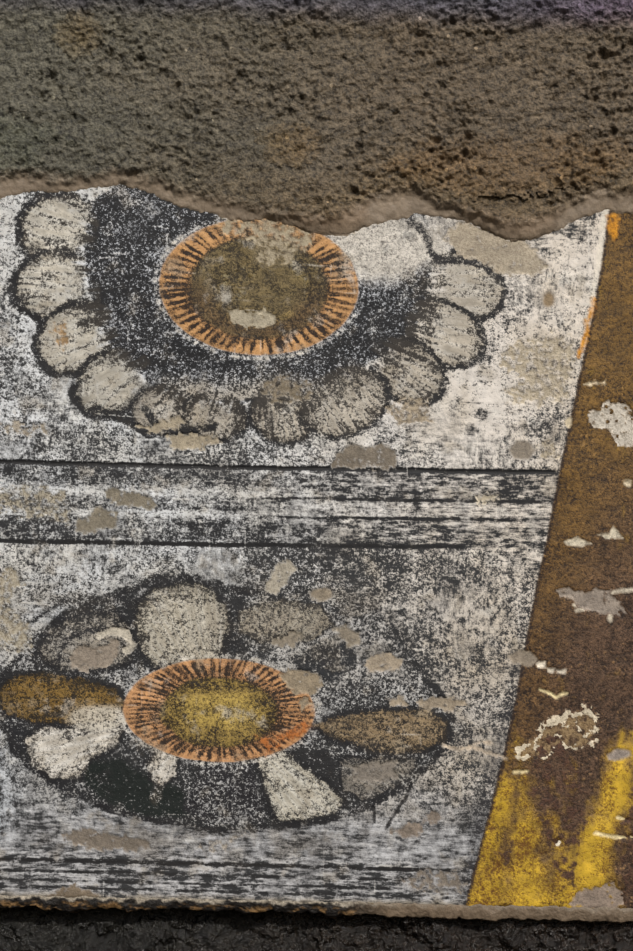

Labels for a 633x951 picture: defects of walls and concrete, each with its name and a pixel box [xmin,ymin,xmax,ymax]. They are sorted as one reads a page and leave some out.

peeling [495,329,607,429]
flaking render [587,398,633,448]
peeling [508,437,563,462]
peeling [556,585,633,624]
peeling [511,687,633,775]
flaking render [592,829,633,840]